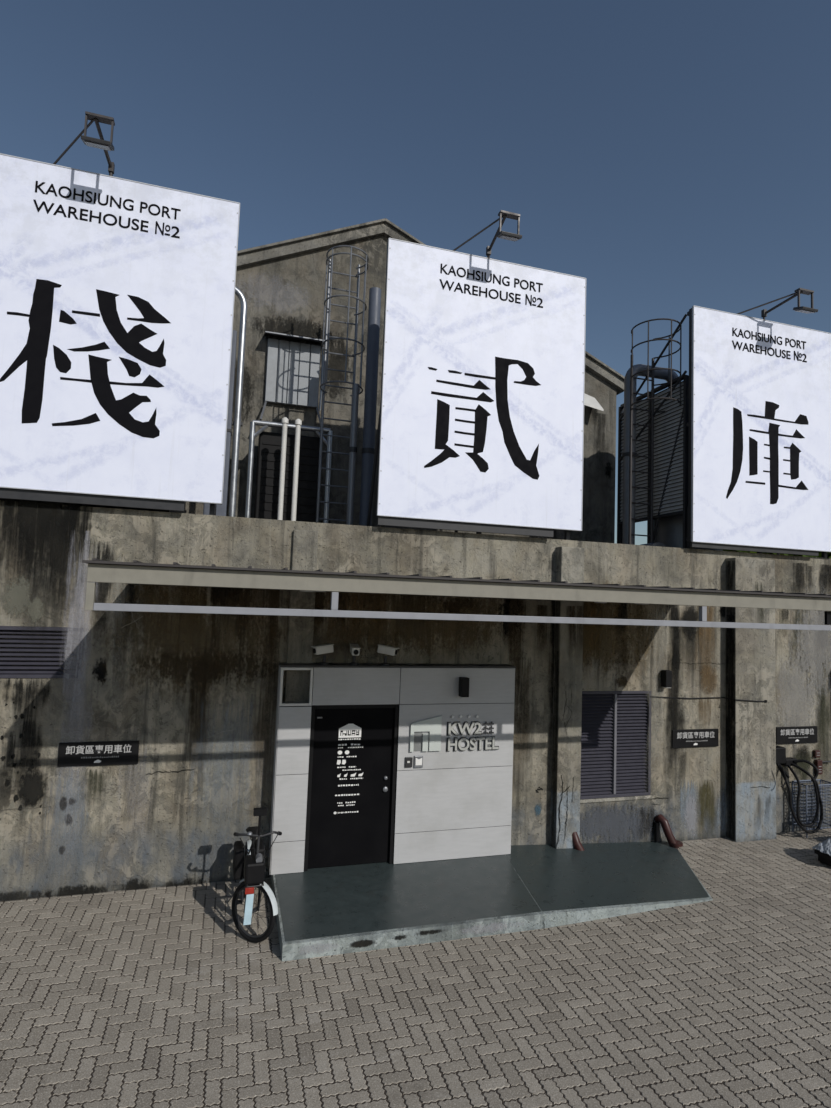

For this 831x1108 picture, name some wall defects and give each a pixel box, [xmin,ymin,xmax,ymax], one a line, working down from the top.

water stain [3,678,50,806]
water stain [0,499,139,699]
water stain [56,769,102,832]
water stain [153,587,280,745]
water stain [667,605,735,840]
water stain [726,561,735,590]
water stain [780,609,800,641]
water stain [782,563,830,594]
water stain [816,611,830,752]